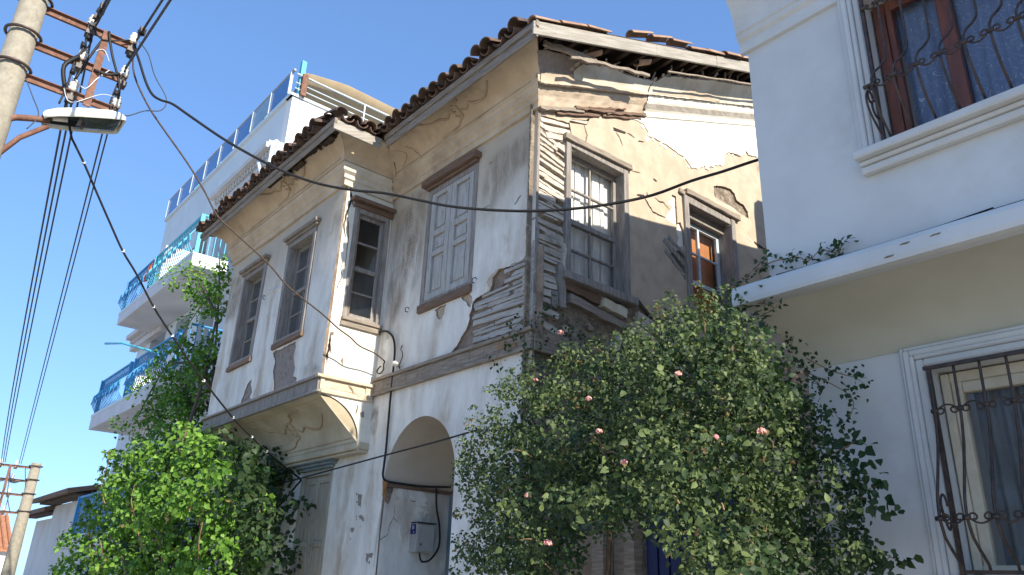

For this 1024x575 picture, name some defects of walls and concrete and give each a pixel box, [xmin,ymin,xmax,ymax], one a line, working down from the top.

peeling [539,61,753,108]
flaking render [456,104,758,350]
flaking render [274,343,297,390]